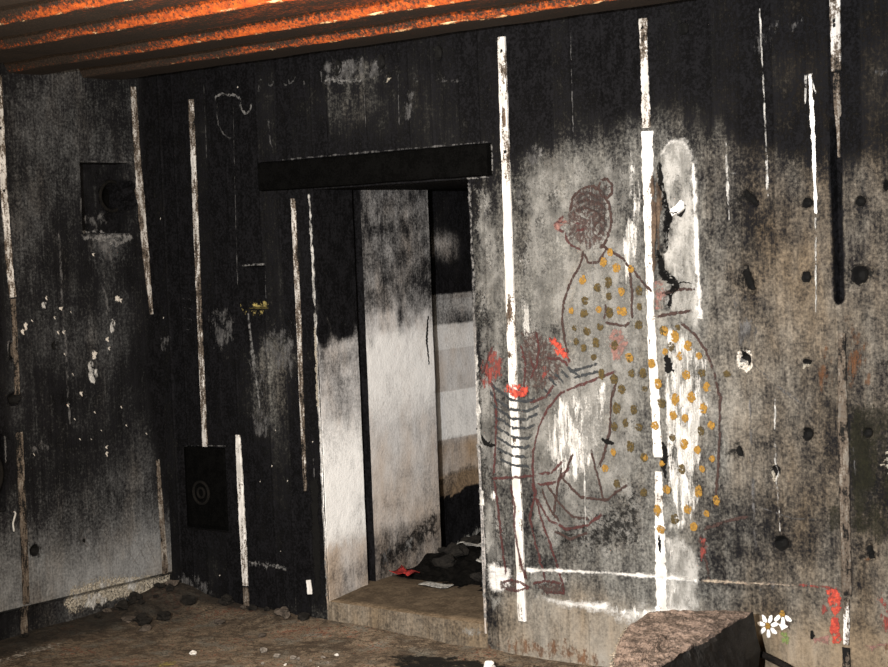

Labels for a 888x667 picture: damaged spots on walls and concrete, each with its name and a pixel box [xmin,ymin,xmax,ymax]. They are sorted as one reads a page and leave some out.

crack [654,163,692,310]
spalling [737,348,753,373]